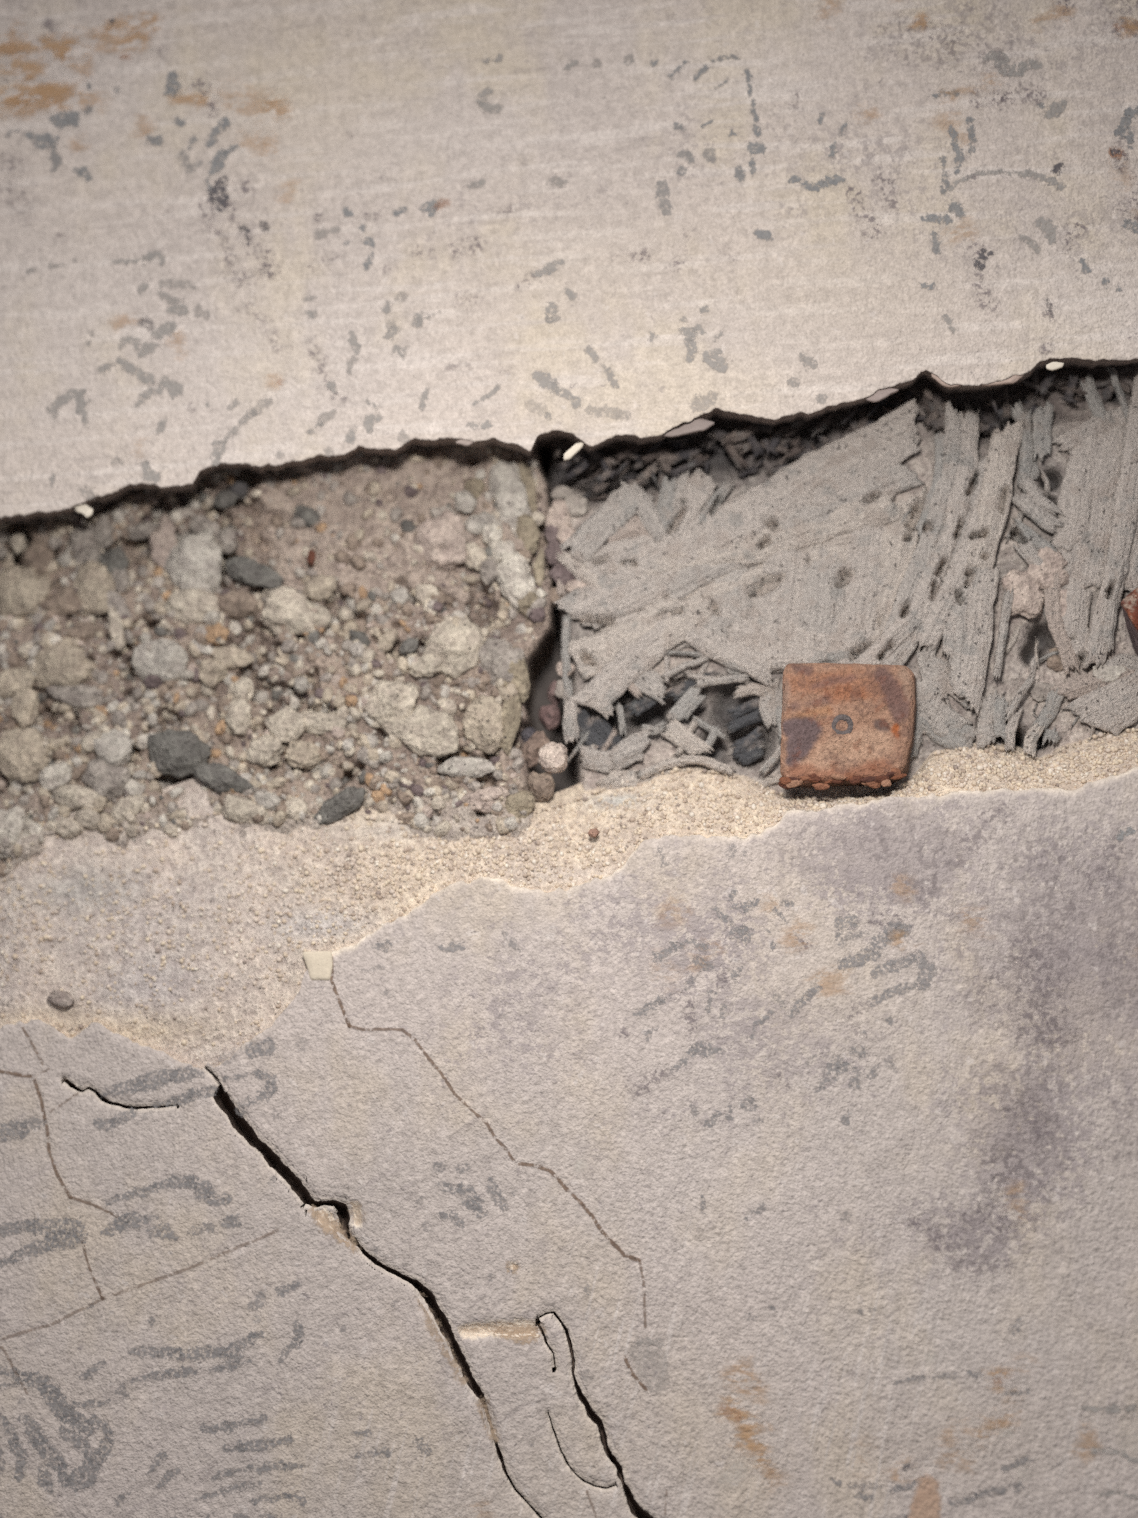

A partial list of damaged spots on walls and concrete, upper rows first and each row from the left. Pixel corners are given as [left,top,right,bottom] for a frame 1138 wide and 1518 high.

peeling [311,330,361,400]
peeling [380,300,440,358]
peeling [532,371,581,409]
peeling [584,345,619,388]
peeling [787,353,818,387]
peeling [980,374,1025,386]
peeling [1042,344,1064,371]
spalling [0,384,1138,1132]
rust [778,768,907,790]
crack [330,957,641,1262]
crack [0,1027,549,1518]
crack [534,1307,660,1518]